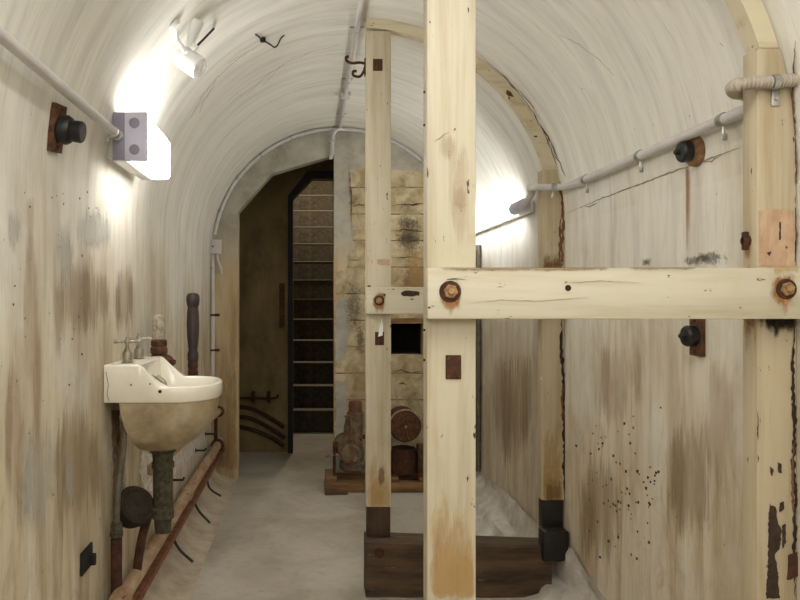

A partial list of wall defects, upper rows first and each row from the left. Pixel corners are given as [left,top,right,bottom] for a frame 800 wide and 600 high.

crack [480,55,738,266]
peeling [766,501,798,599]